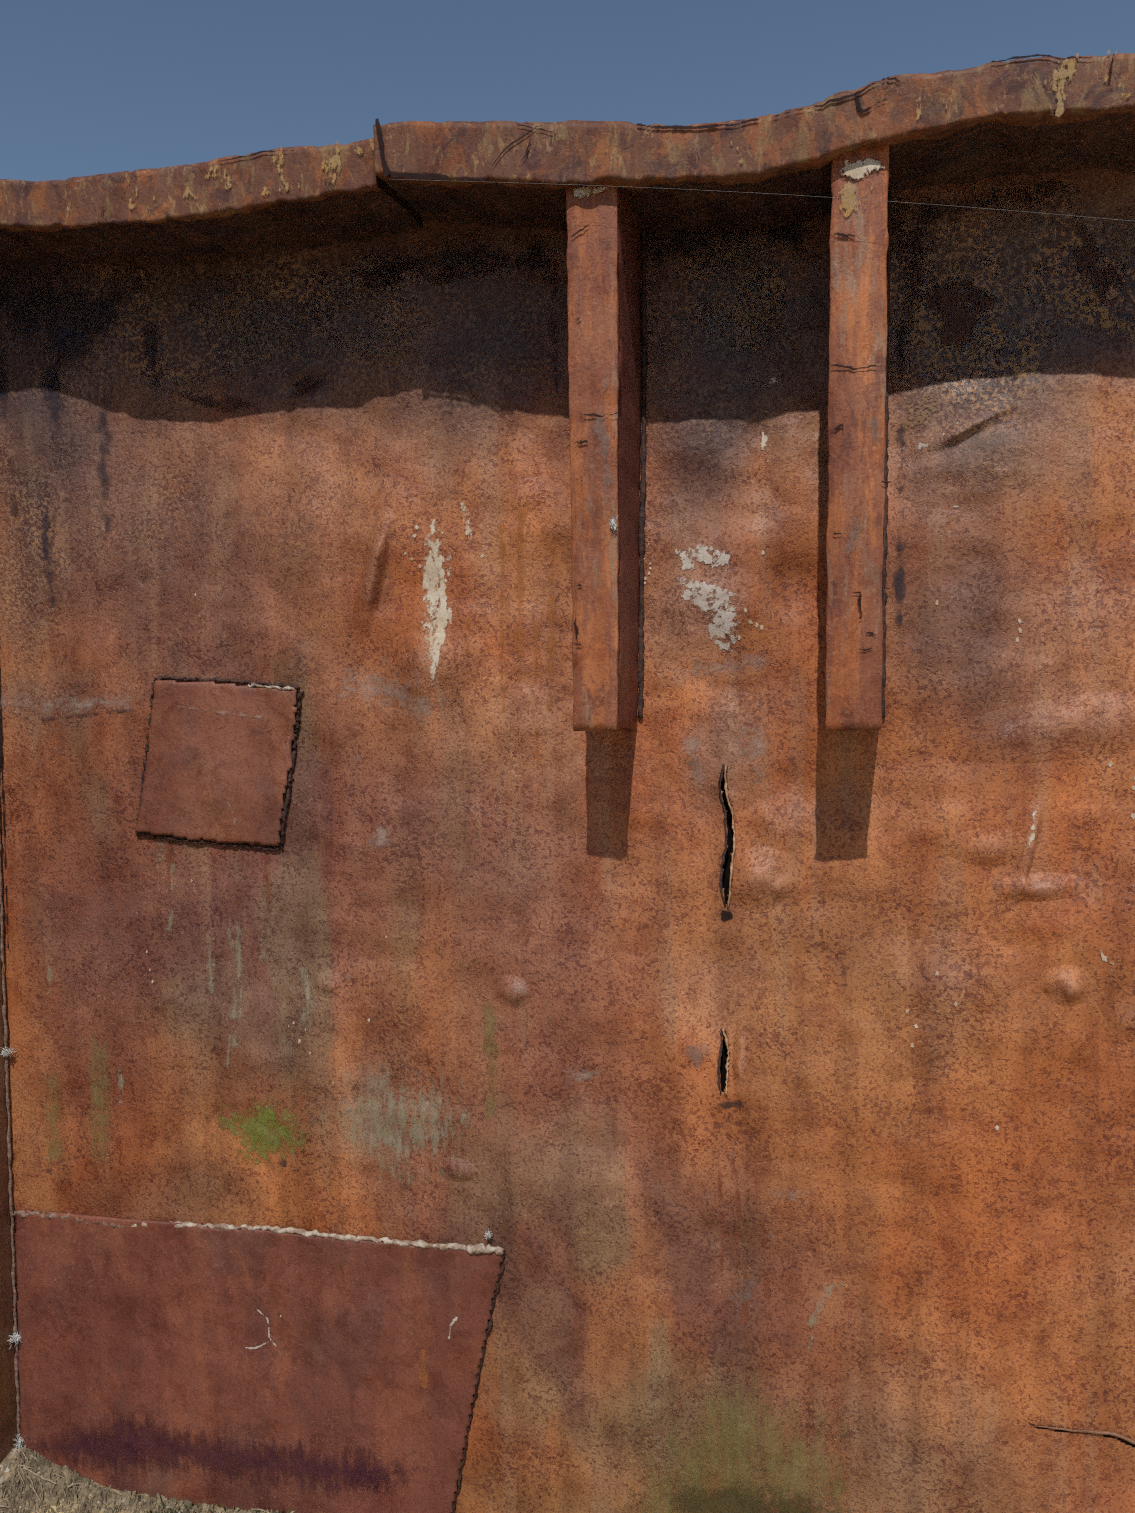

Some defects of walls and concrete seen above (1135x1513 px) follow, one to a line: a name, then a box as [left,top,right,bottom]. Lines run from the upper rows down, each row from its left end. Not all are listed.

peeling [404,519,452,715]
peeling [675,544,764,651]
crack [719,764,736,945]
crack [717,1028,742,1109]
leakage [221,1105,305,1164]
leakage [44,1419,405,1489]
crack [1025,1420,1135,1447]